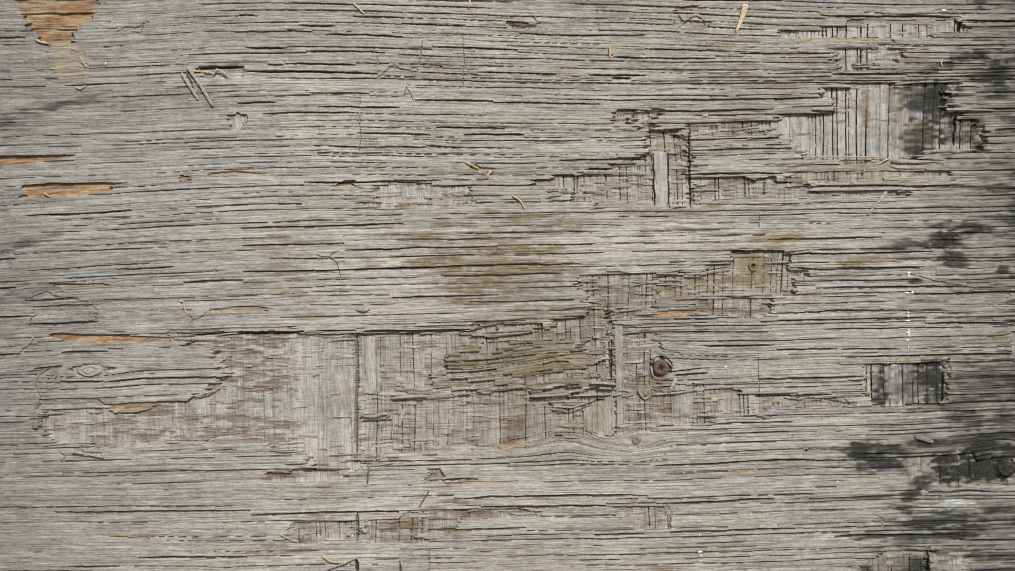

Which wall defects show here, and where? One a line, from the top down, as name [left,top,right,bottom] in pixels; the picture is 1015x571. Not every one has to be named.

peeling [779,19,973,70]
damp [899,51,1012,155]
peeling [529,82,994,209]
damp [882,221,983,267]
peeling [29,246,857,482]
peeling [862,358,951,409]
damp [871,359,959,410]
peeling [424,468,446,485]
damp [847,431,1015,540]
peeling [858,536,974,571]